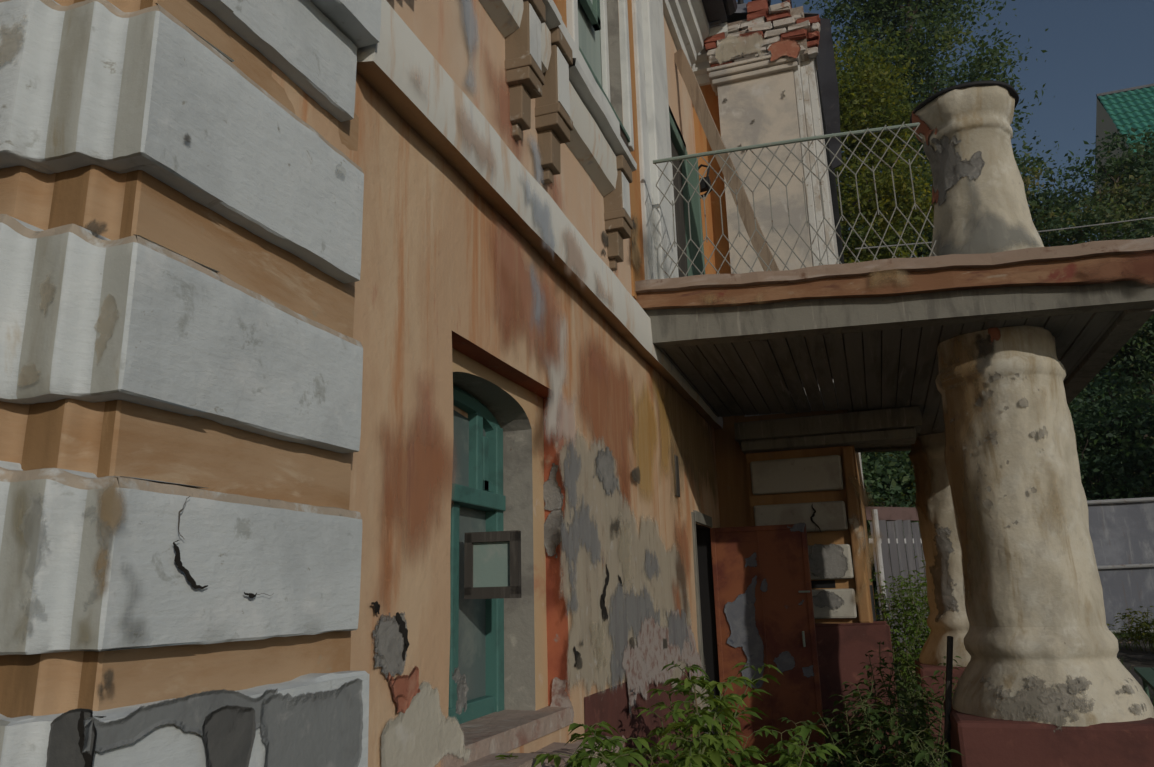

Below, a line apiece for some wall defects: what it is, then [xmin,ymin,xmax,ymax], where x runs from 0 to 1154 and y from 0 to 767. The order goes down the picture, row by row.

spalling [703,0,821,70]
flaking render [912,111,985,212]
crack [173,496,208,589]
crack [810,504,822,533]
crack [244,591,274,599]
flaking render [543,430,711,722]
flaking render [809,543,848,609]
flaking render [372,612,407,678]
spalling [98,670,113,694]
peeling [202,678,363,767]
flaking render [980,675,1094,732]
flaking render [1119,678,1147,715]